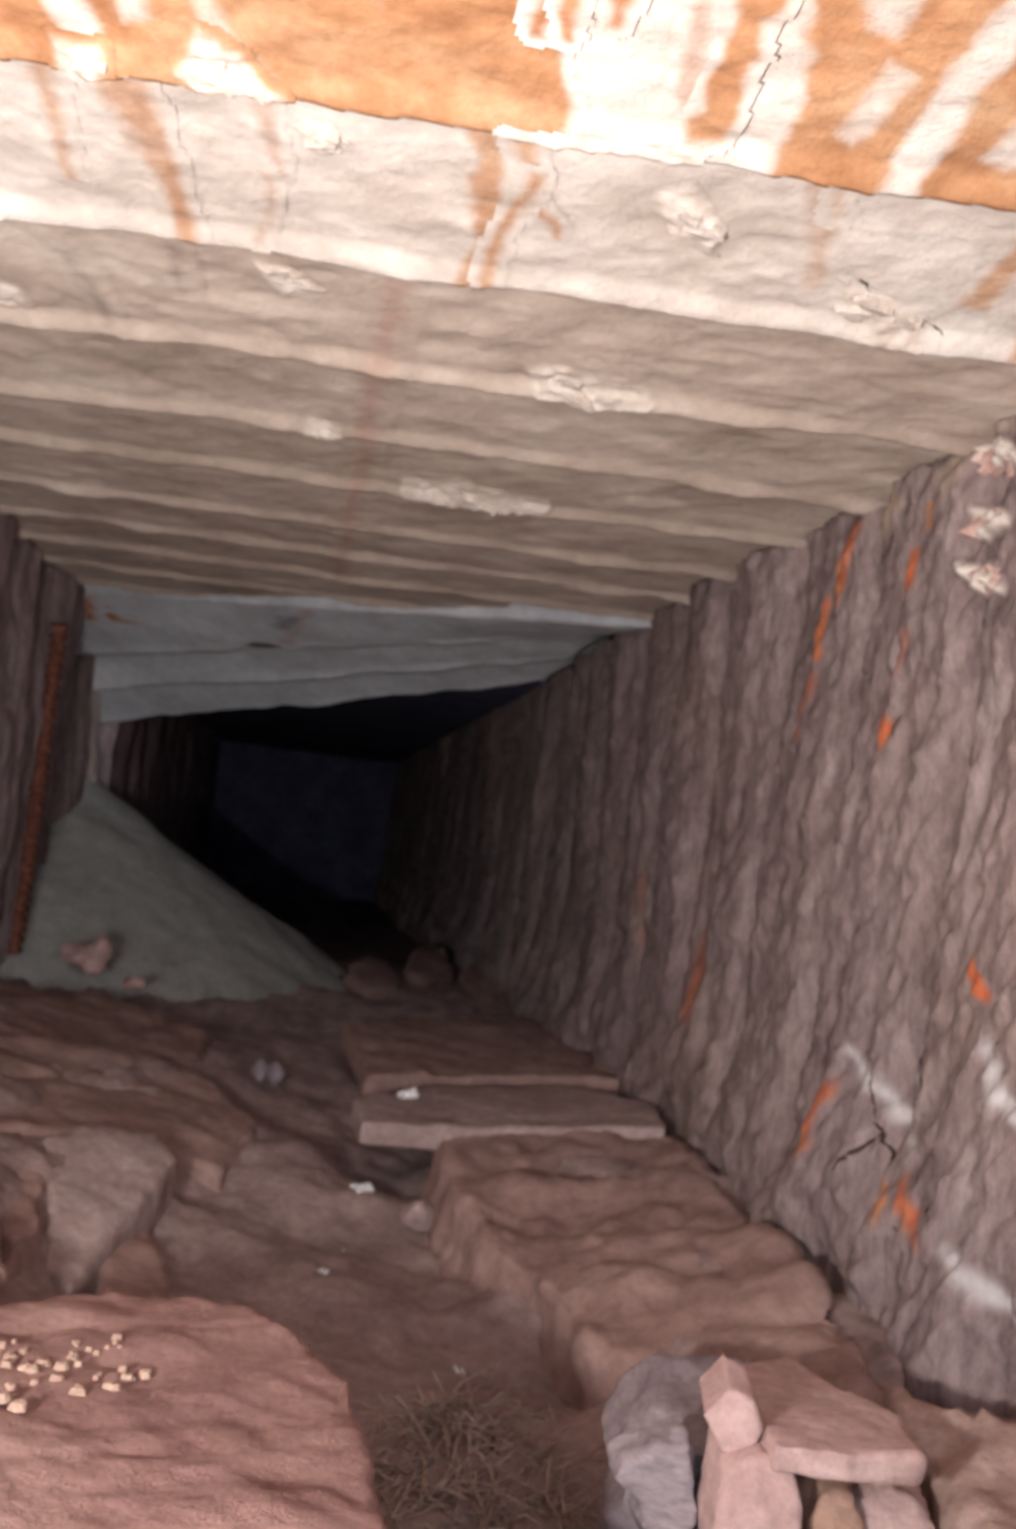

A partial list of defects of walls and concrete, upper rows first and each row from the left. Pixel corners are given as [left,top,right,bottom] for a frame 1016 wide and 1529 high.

corrosion [0,0,652,290]
corrosion [655,0,1016,319]
corrosion [994,326,1016,367]
corrosion [790,513,874,751]
corrosion [874,700,902,761]
corrosion [888,491,937,682]